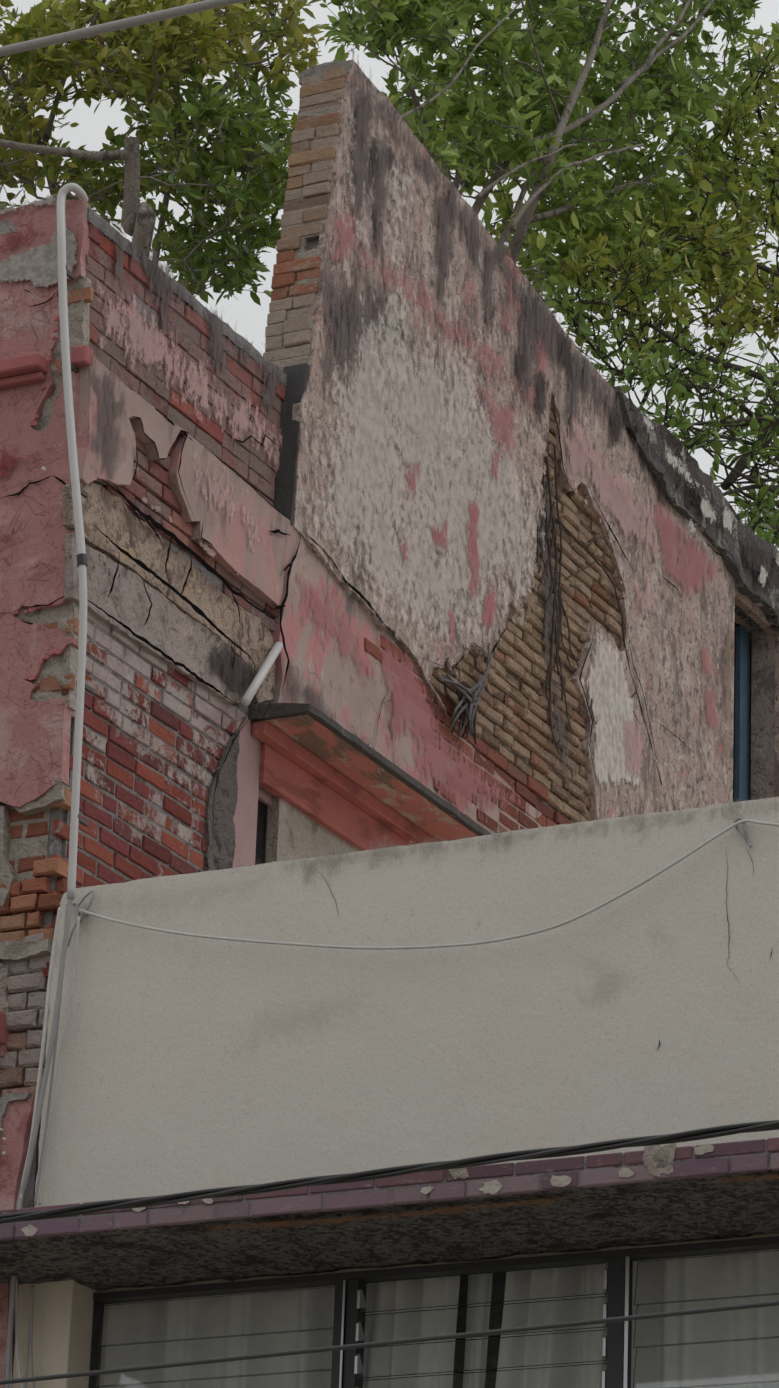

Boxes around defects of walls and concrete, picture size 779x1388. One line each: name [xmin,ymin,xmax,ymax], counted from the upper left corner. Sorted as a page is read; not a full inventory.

peeling [0,223,283,469]
water stain [319,48,716,522]
spalling [14,601,79,711]
spalling [103,419,279,632]
crack [0,382,528,847]
peeling [303,131,661,833]
water stain [742,532,779,600]
spalling [0,781,72,1154]
spalling [449,1167,502,1195]
spalling [550,1175,572,1187]
spalling [618,1143,676,1178]
spalling [694,1143,714,1155]